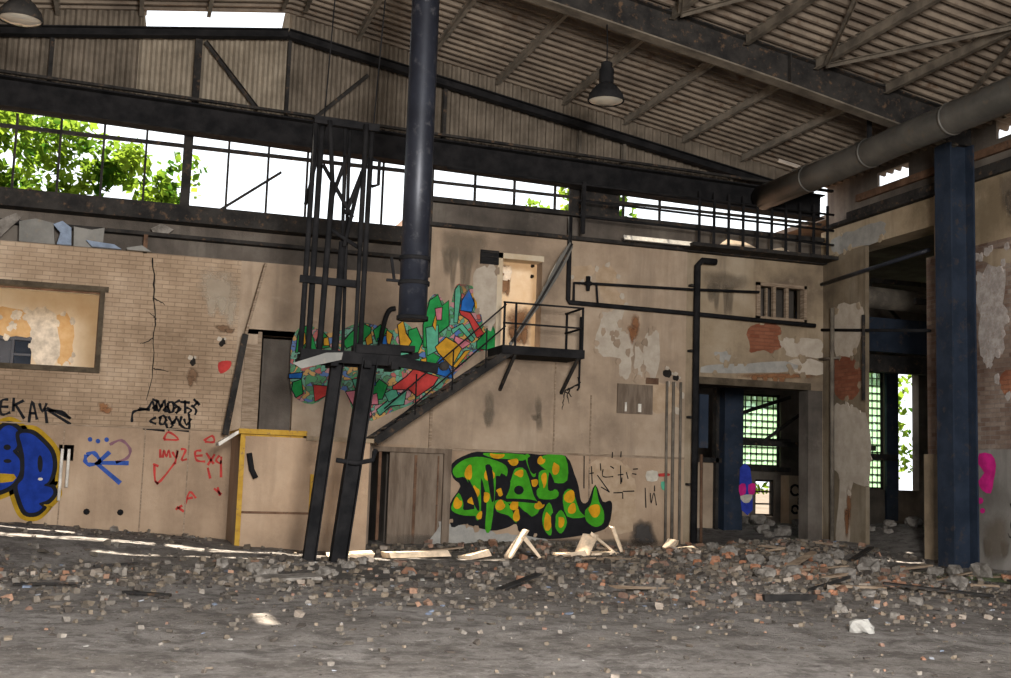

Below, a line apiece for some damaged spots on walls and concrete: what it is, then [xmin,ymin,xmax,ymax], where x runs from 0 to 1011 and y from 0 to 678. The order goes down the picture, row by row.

peeling [0,306,76,366]
crack [140,258,168,400]
peeling [571,262,685,415]
peeling [976,242,1011,401]
peeling [692,302,872,542]